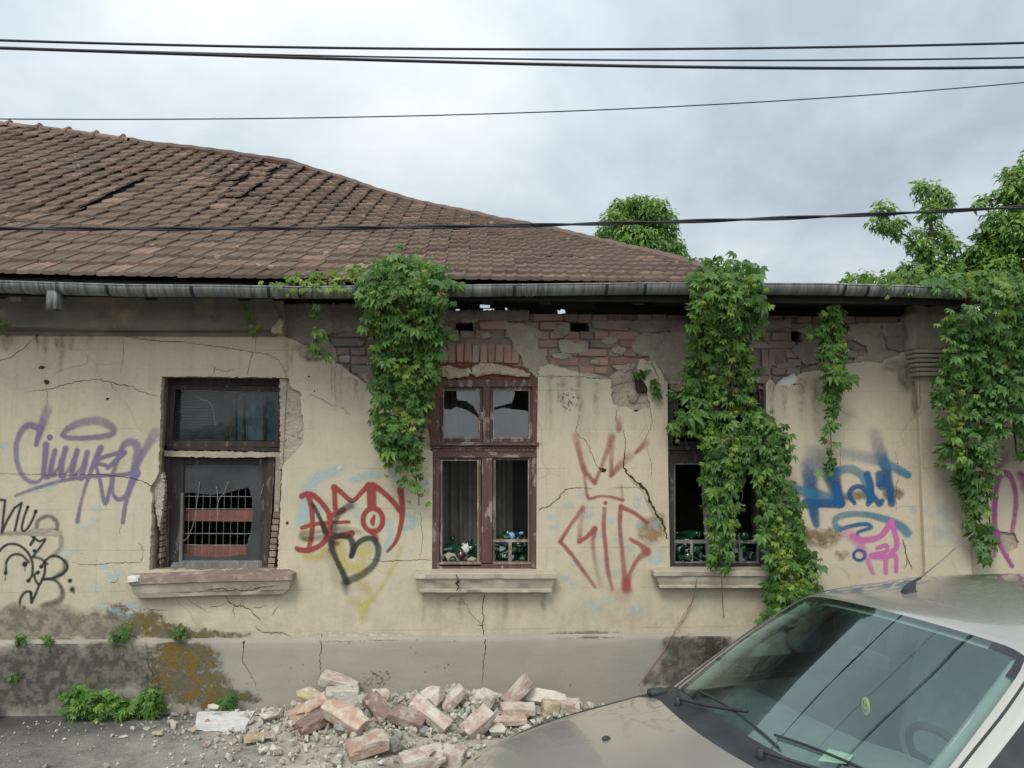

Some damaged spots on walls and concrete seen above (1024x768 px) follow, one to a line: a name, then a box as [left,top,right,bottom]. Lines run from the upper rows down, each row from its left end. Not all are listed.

crack [29,336,285,410]
flaking render [271,303,906,450]
spalling [278,378,304,471]
spalling [152,472,167,531]
crack [539,408,668,539]
spalling [999,531,1017,553]
crack [190,584,289,685]
crack [446,574,486,679]
leakage [646,636,728,686]